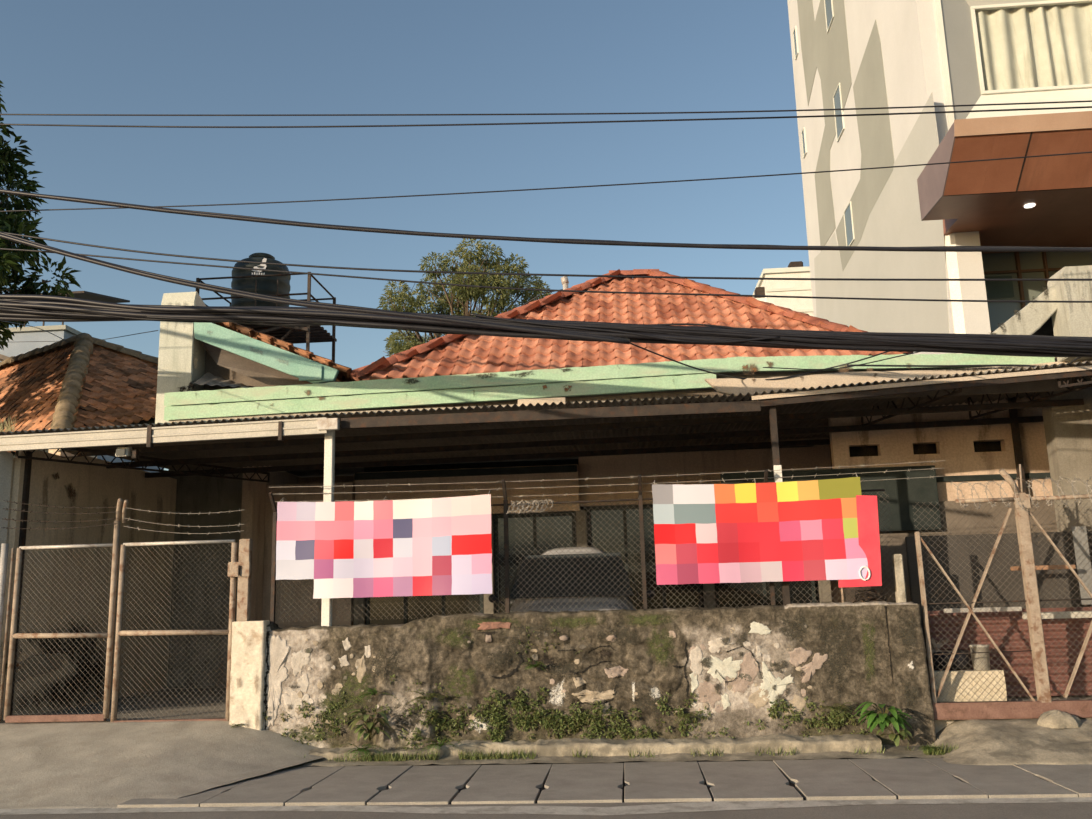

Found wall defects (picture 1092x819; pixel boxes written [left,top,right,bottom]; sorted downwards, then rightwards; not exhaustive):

spalling [263,634,379,730]
spalling [456,703,489,733]
spalling [478,616,629,717]
peeling [689,622,828,715]